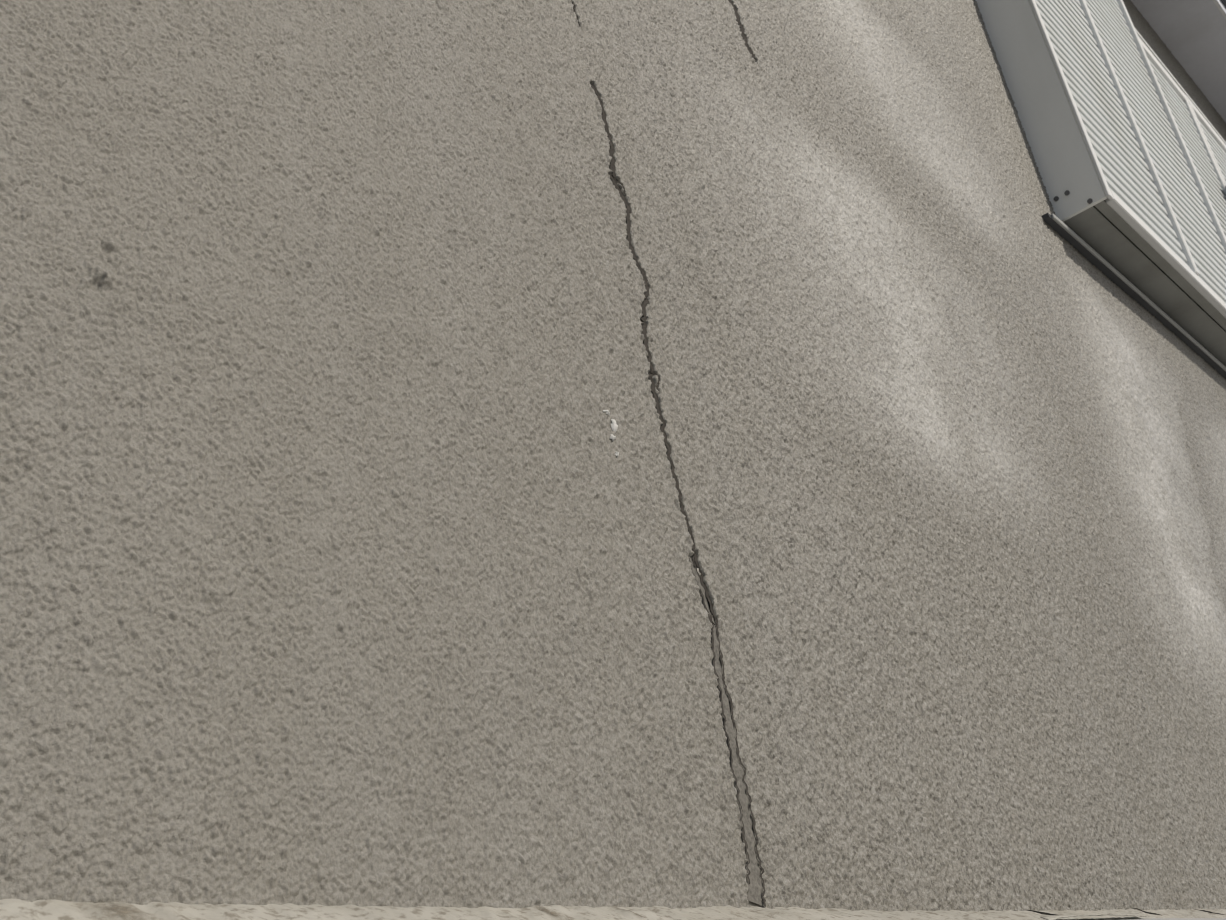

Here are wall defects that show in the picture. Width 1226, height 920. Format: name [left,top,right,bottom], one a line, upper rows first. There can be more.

crack [728,0,756,61]
crack [591,83,766,907]